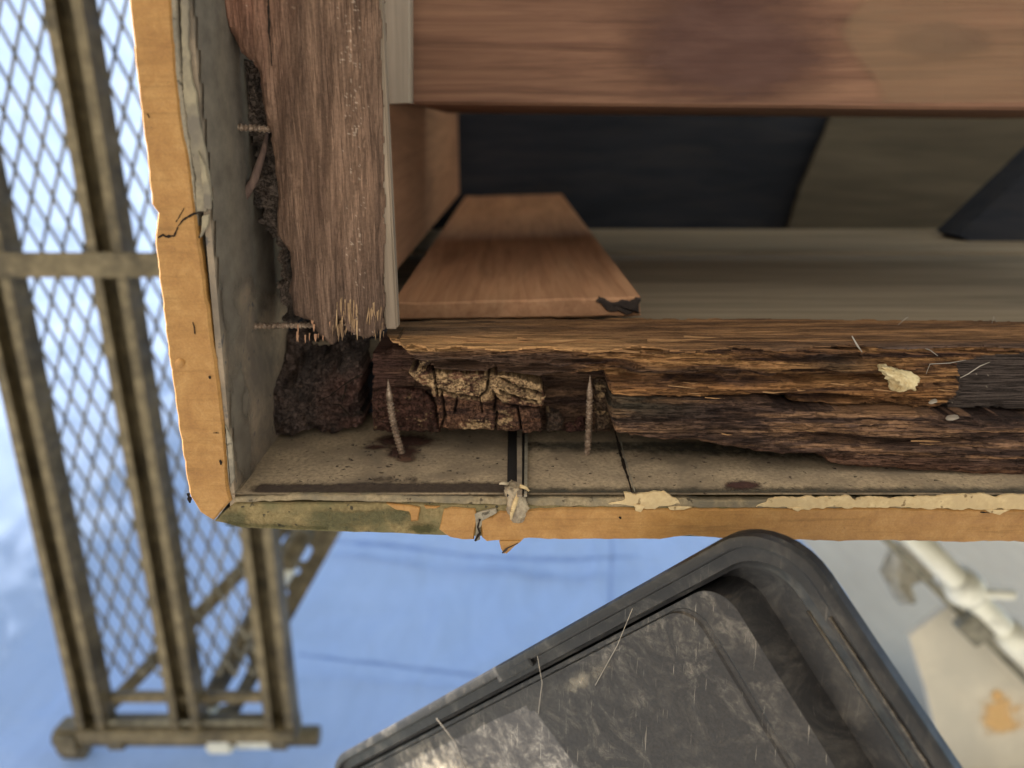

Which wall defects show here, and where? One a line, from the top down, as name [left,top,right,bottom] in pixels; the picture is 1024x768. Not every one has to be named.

crack [158,208,204,238]
crack [614,431,635,492]
peeling [386,502,440,521]
spalling [474,508,497,541]
peeling [608,490,691,519]
peeling [756,492,1024,515]